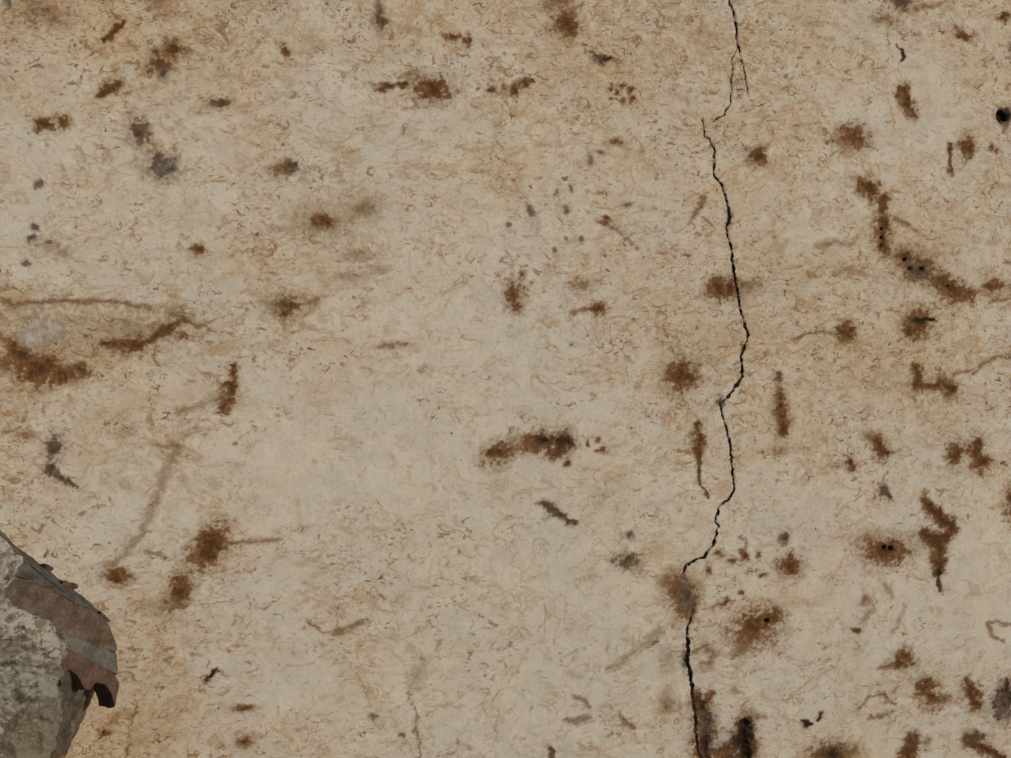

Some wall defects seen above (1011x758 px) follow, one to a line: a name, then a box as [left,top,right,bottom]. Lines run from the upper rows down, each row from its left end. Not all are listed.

crack [682,0,750,575]
rust [982,278,1011,302]
rust [662,358,702,394]
rust [911,355,1011,400]
rust [480,427,577,467]
rust [943,436,994,475]
rust [164,520,279,613]
crack [680,608,703,758]
rust [704,690,716,704]